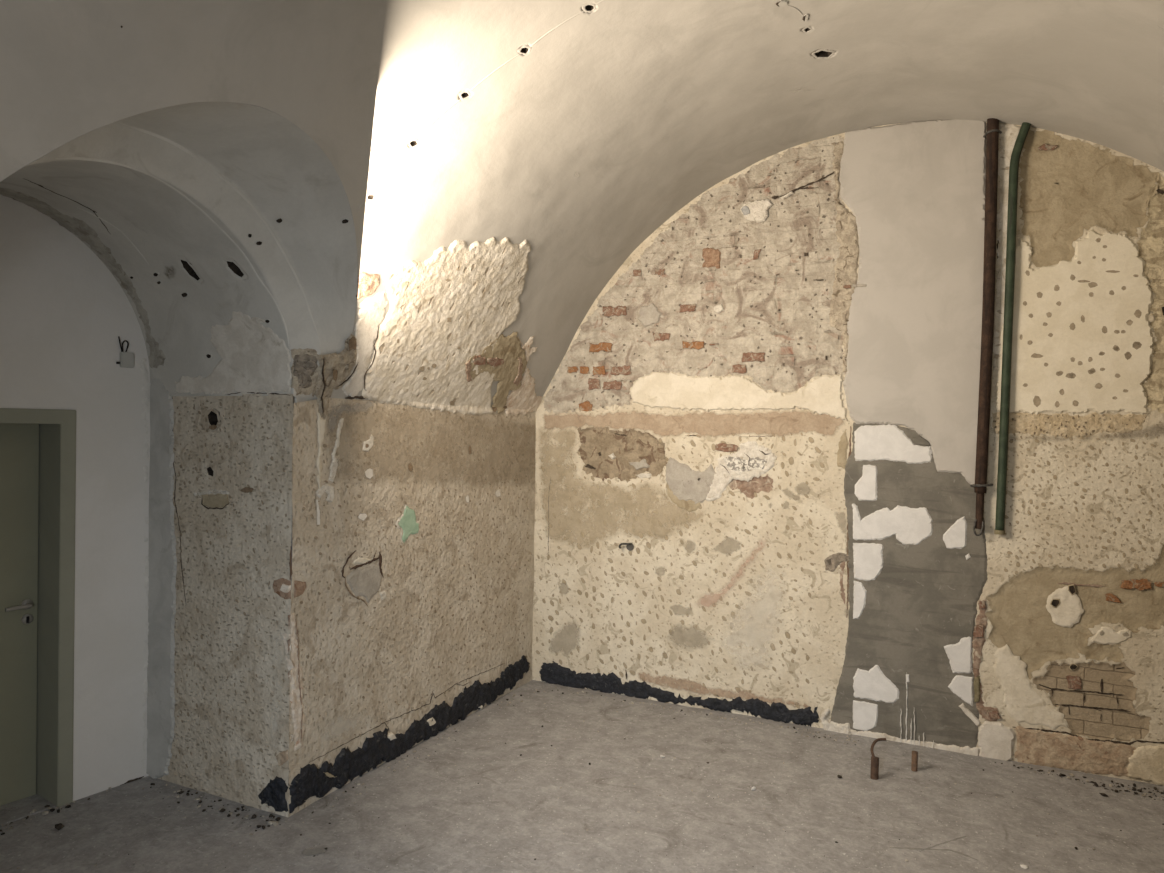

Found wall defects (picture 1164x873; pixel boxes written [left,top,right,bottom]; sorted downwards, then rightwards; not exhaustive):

flaking render [290,135,866,418]
flaking render [992,124,1164,440]
flaking render [316,417,344,502]
flaking render [362,434,374,452]
flaking render [577,426,668,482]
flaking render [698,441,809,508]
flaking render [716,538,740,554]
flaking render [820,422,1164,777]
crack [1014,727,1164,745]